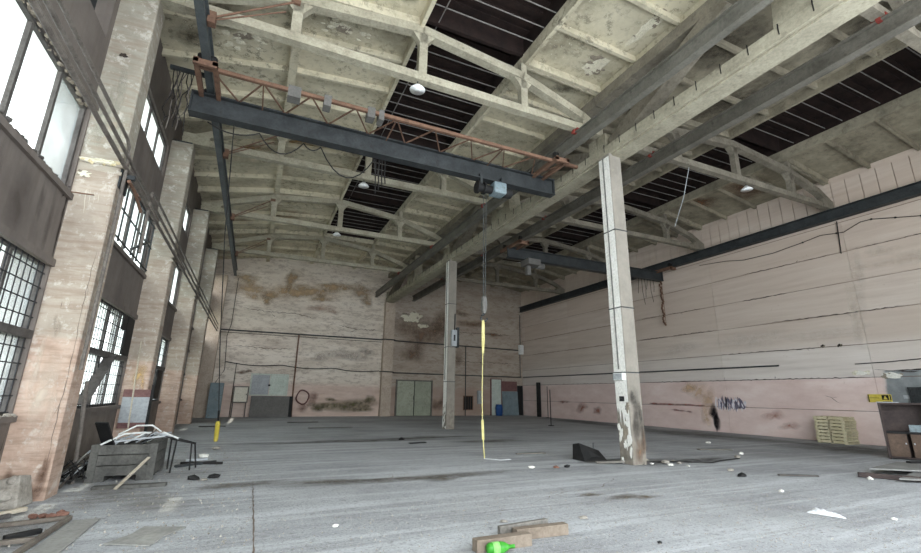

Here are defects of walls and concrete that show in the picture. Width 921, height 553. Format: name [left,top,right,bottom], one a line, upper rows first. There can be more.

water stain [239,273,371,305]
peeling [400,311,429,329]
spalling [617,402,632,464]
water stain [652,403,725,437]